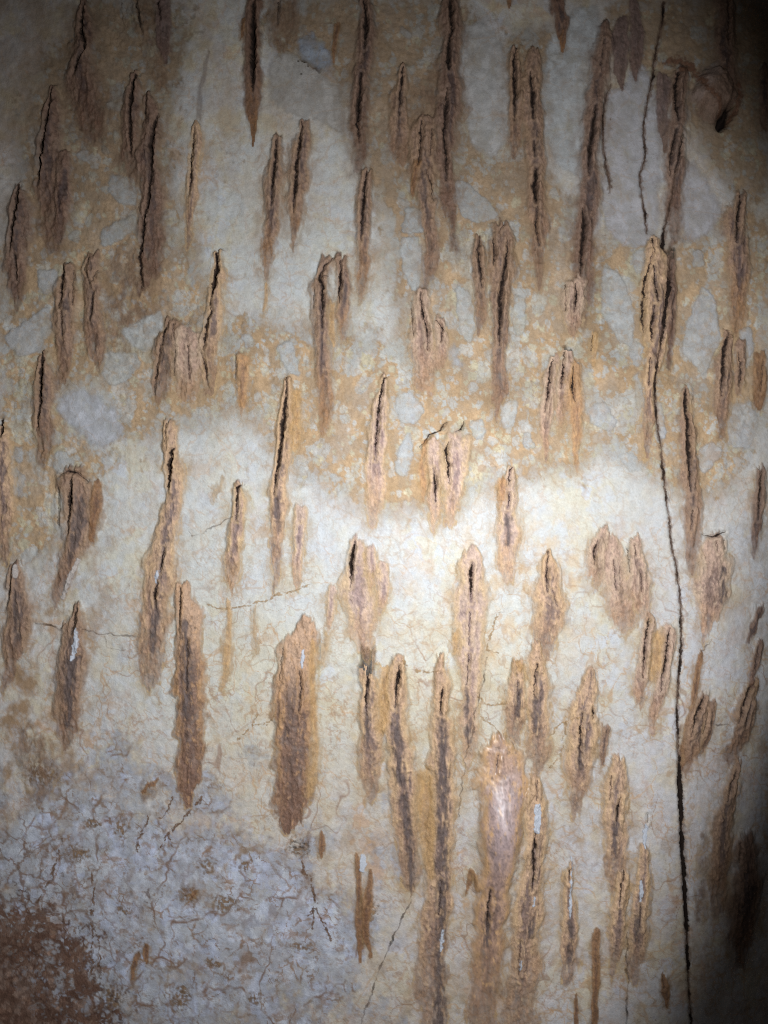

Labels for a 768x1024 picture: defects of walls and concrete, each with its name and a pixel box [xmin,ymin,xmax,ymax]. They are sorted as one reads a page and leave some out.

corrosion [311,0,377,435]
corrosion [538,0,644,464]
corrosion [638,64,689,462]
crack [36,838,63,903]
corrosion [52,465,103,747]
crack [90,874,101,984]
crack [136,796,202,852]
corrosion [137,419,208,809]
leakage [0,739,379,1024]
crack [299,853,332,941]
corrosion [271,465,654,1024]
crack [639,1,693,1024]